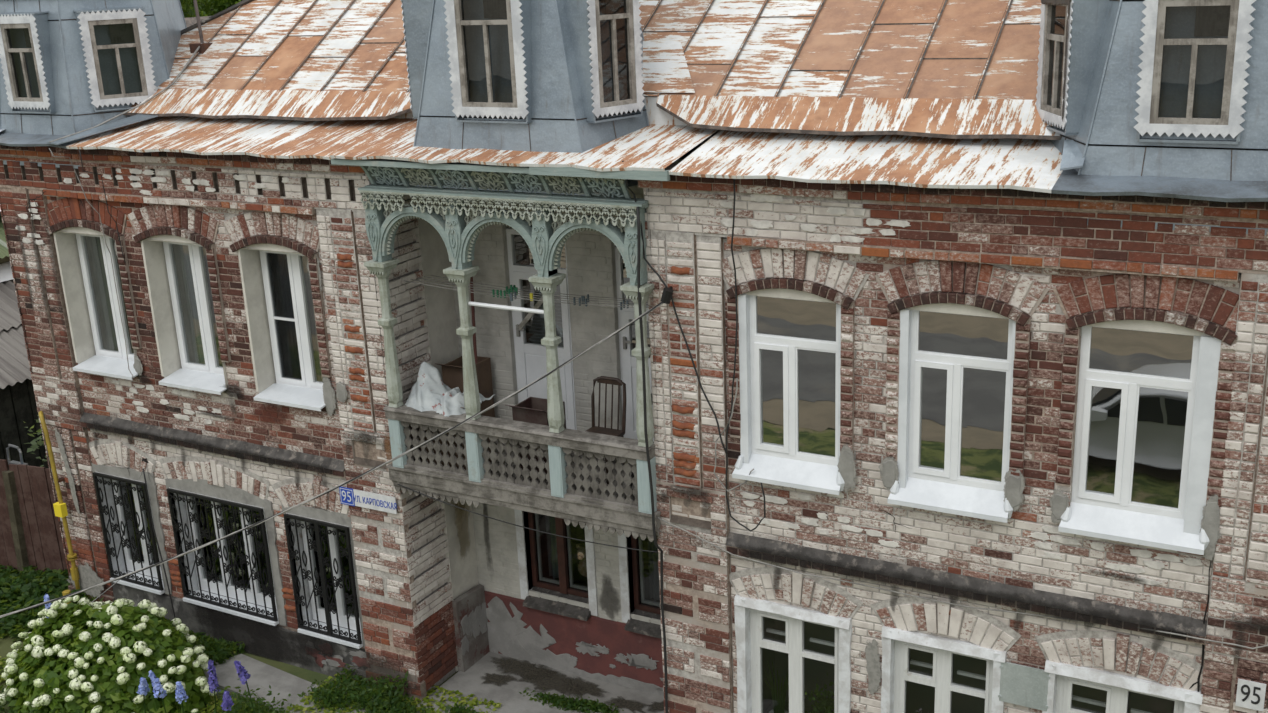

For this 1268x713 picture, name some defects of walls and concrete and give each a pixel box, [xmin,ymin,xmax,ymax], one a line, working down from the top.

peeling [461,596,664,696]